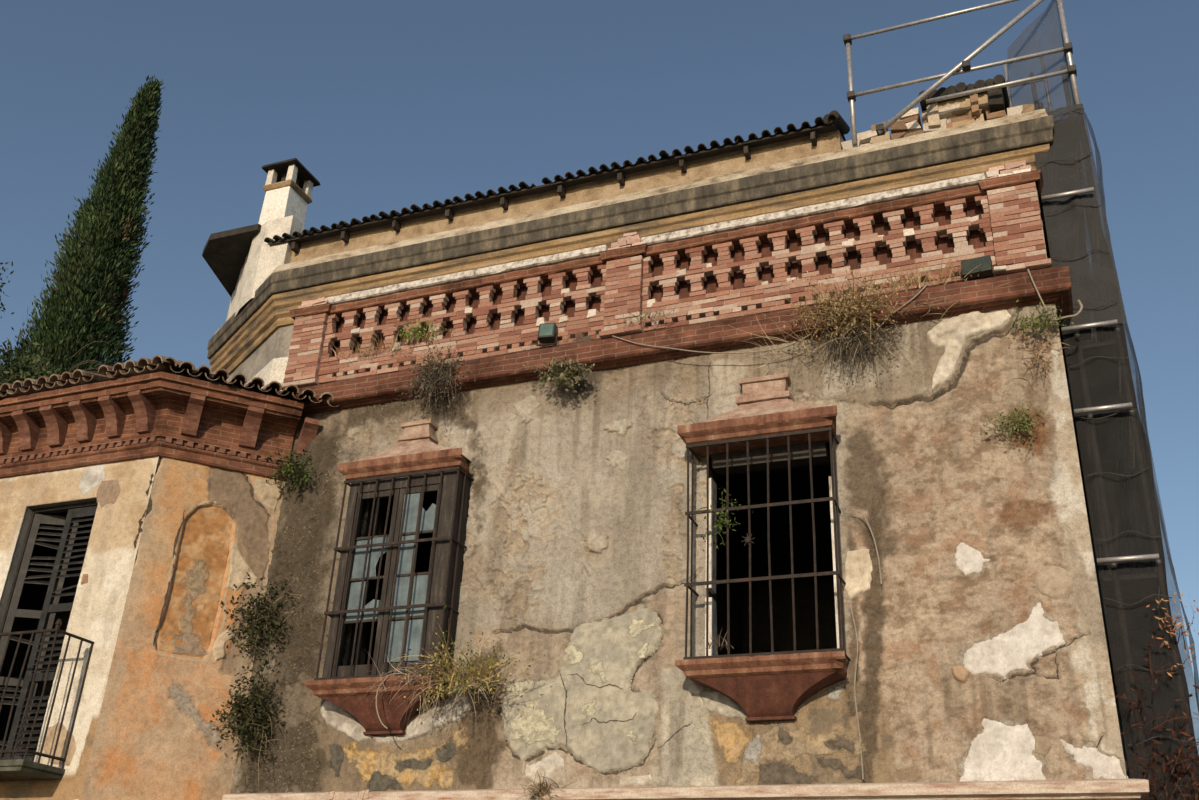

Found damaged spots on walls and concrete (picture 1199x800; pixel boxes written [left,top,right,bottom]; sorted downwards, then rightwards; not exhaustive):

flaking render [872,309,1020,410]
crack [134,458,161,560]
spalling [206,467,283,591]
spalling [955,542,990,575]
flaking render [212,629,236,661]
crack [496,576,696,634]
spalling [951,602,1087,684]
peeling [320,696,471,791]
spalling [525,752,565,786]
peeling [699,690,866,785]
peeling [828,684,859,713]
spalling [956,718,1128,781]